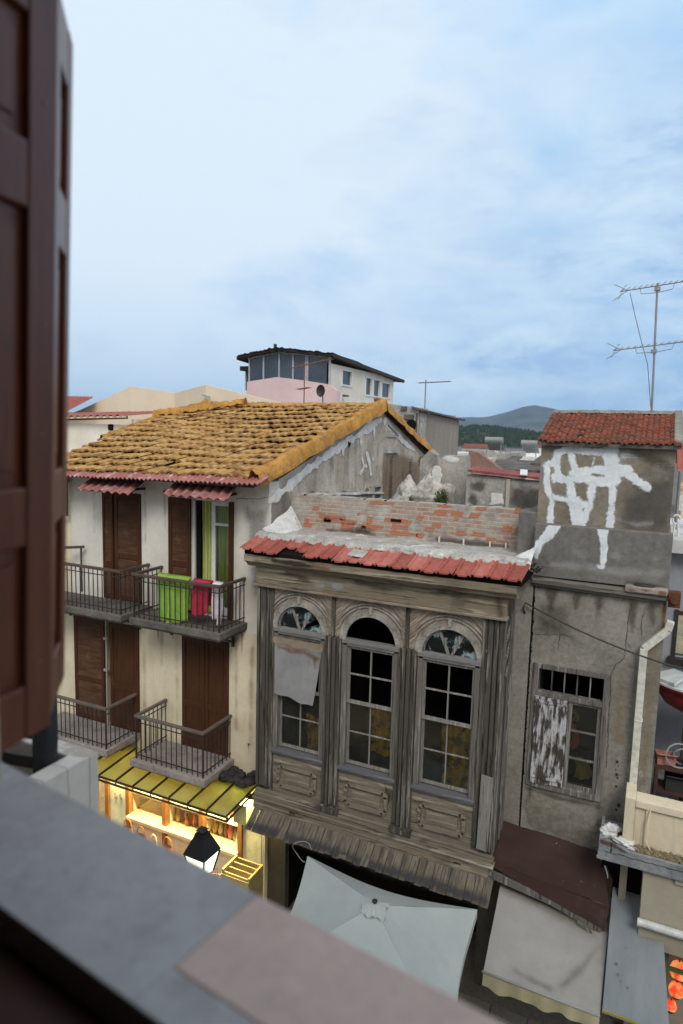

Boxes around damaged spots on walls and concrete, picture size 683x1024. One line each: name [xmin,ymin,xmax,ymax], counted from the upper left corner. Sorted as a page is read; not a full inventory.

spalling [303,488,523,541]
leakage [624,482,669,528]
crack [605,603,645,769]